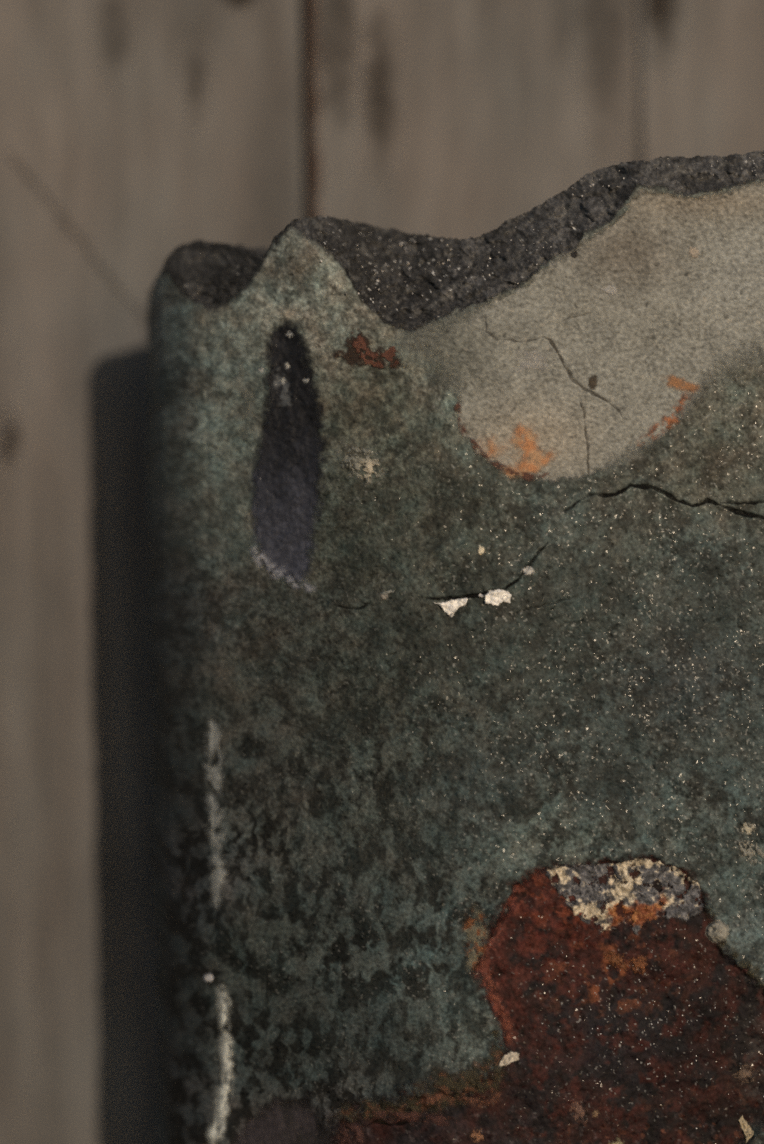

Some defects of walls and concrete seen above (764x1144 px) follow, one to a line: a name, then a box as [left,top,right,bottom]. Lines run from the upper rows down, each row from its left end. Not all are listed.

crack [162,150,764,331]
corrosion [333,332,400,368]
spalling [415,182,764,482]
corrosion [455,403,550,480]
crack [546,338,764,519]
corrosion [648,376,696,435]
crack [339,590,395,609]
crack [429,545,546,617]
corrosion [328,855,764,1144]